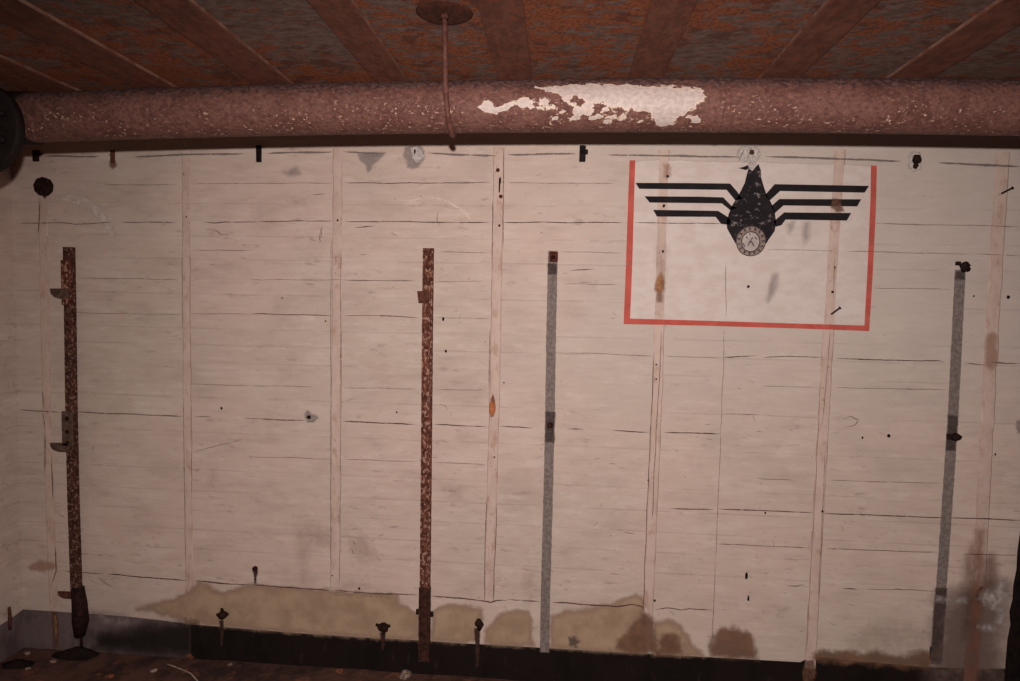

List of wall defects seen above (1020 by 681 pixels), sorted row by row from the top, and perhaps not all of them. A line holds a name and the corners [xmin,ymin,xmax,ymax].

peeling [478,83,707,127]
water stain [137,582,419,650]
water stain [431,605,533,668]
water stain [550,595,756,658]
water stain [814,583,1005,681]